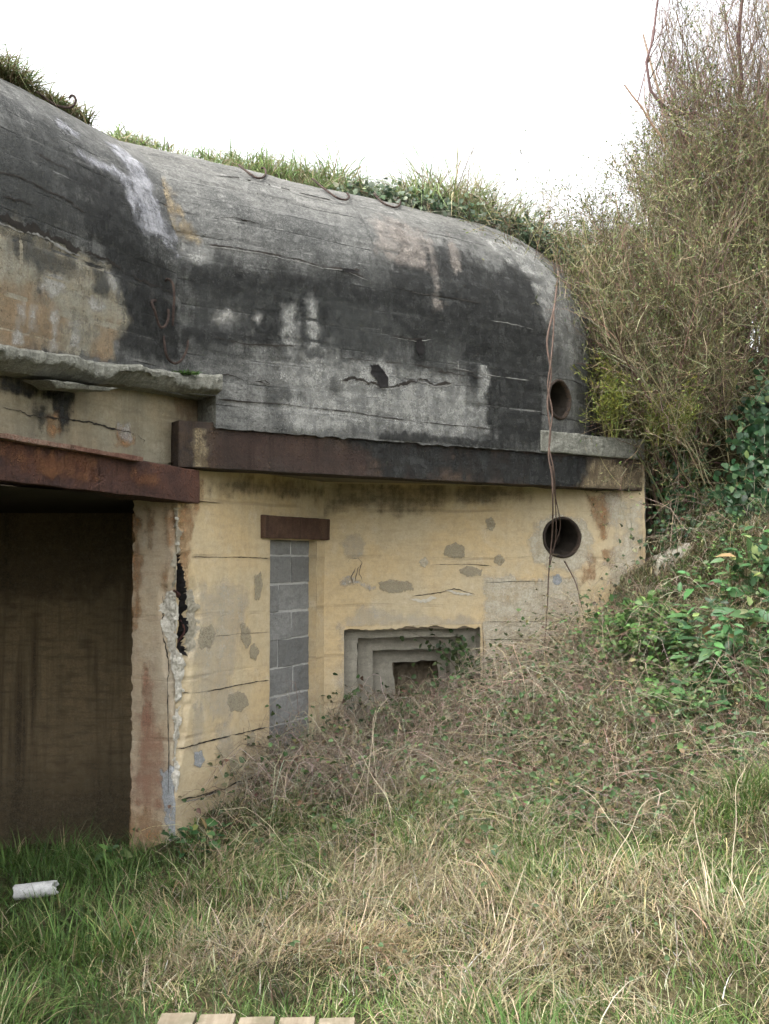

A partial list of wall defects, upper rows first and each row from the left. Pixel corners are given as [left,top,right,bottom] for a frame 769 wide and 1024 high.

leakage [0,121,588,512]
spalling [370,364,388,388]
crack [340,370,485,389]
crack [4,407,145,441]
corrosion [194,428,208,467]
spalling [159,508,201,793]